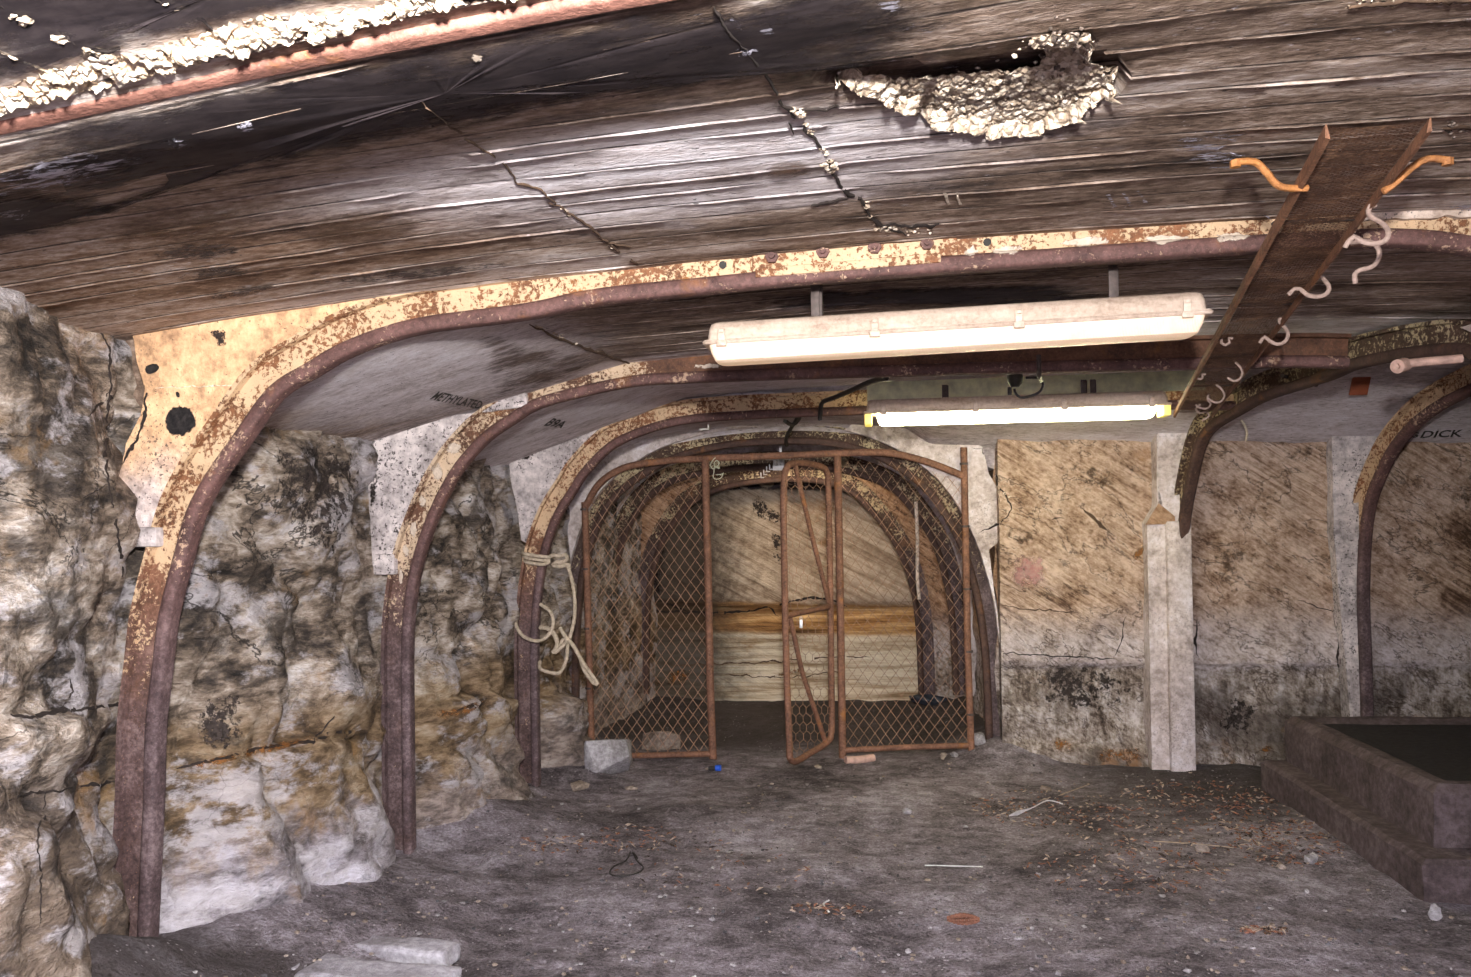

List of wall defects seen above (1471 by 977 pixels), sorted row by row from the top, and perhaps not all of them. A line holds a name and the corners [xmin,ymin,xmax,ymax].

crack [714,7,939,236]
water stain [0,152,138,220]
crack [420,100,639,266]
water stain [120,213,274,299]
water stain [316,263,507,286]
rust [197,735,312,767]